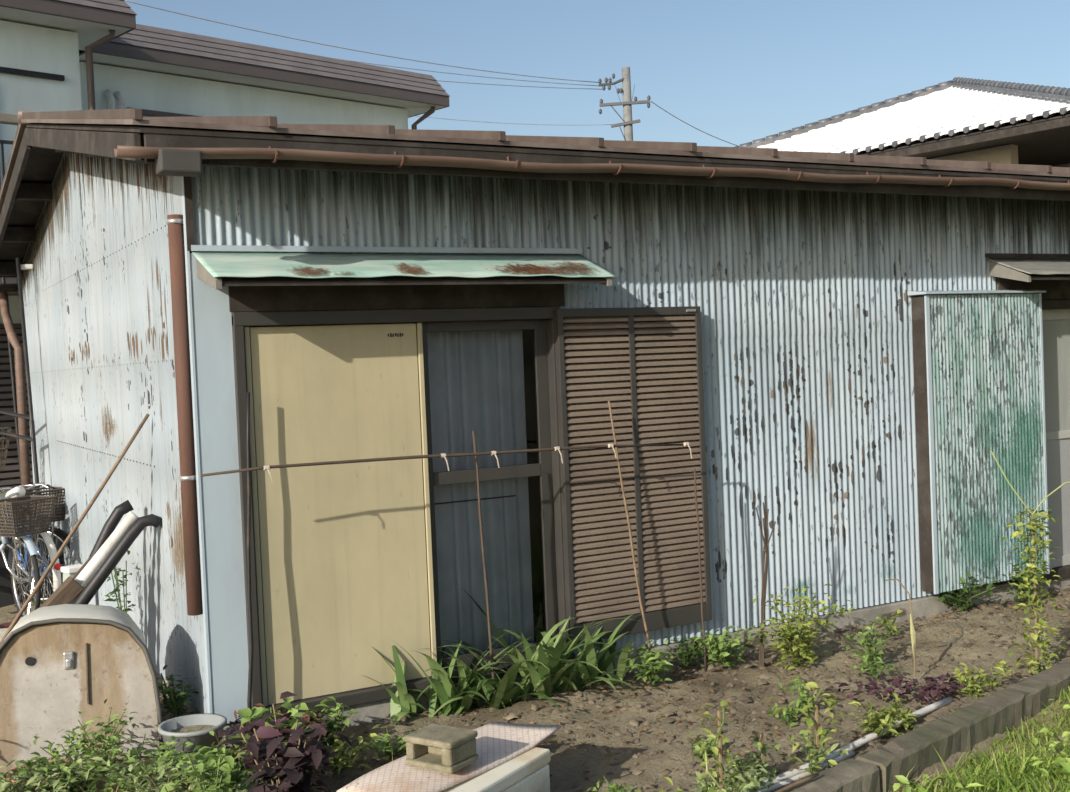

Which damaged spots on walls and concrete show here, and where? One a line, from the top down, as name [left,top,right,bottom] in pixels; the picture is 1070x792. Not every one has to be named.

leakage [21,154,69,288]
leakage [397,174,951,249]
leakage [967,197,1070,245]
rust [292,267,354,275]
rust [395,263,429,274]
rust [496,261,596,274]
rust [69,265,168,367]
rust [806,429,815,463]
peeling [961,367,1042,583]
rust [167,505,185,576]